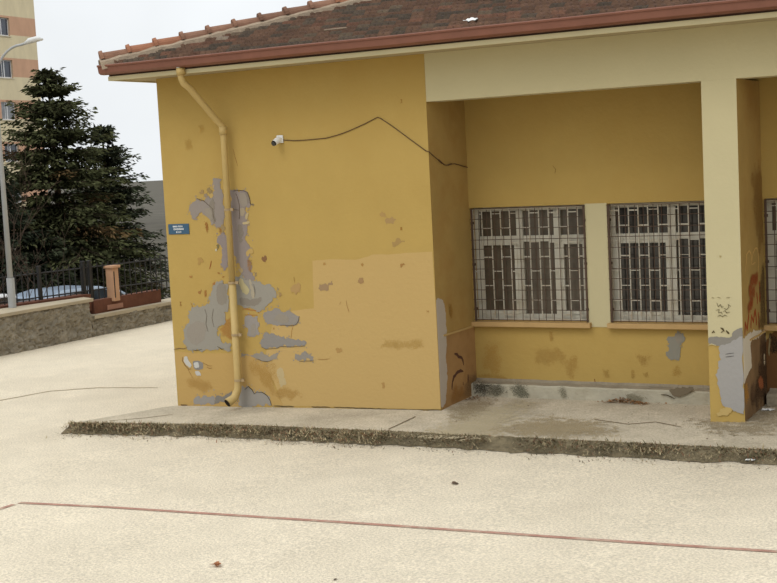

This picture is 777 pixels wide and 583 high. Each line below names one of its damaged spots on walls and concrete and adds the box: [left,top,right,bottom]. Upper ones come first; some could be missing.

peeling [180,177,314,387]
peeling [666,330,685,361]
peeling [181,383,274,407]